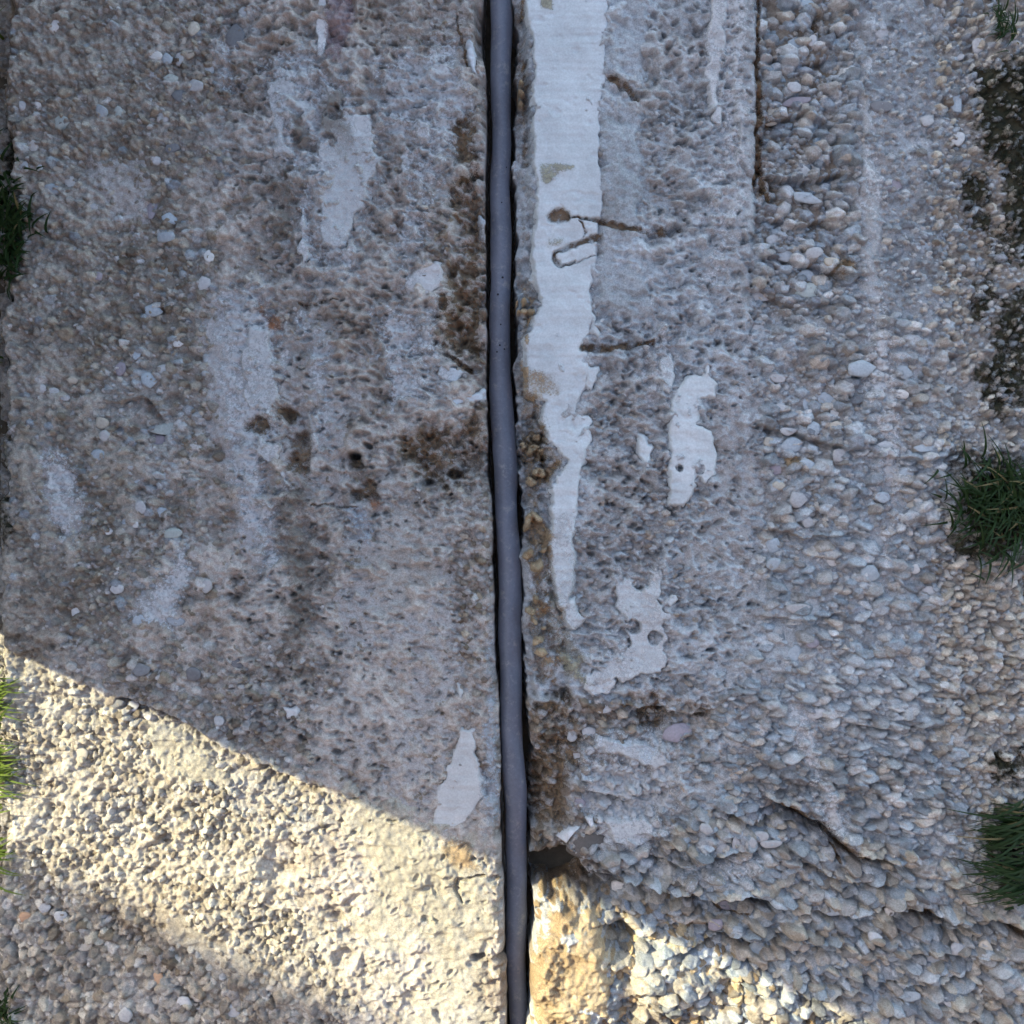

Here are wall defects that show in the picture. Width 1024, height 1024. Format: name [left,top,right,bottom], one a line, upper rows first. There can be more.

damp [215,35,236,94]
damp [262,0,474,412]
damp [541,163,574,184]
crack [752,0,769,204]
damp [545,513,683,690]
crack [780,803,885,864]